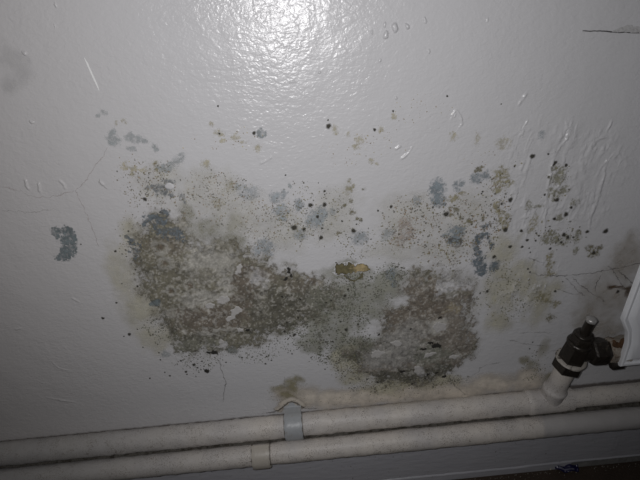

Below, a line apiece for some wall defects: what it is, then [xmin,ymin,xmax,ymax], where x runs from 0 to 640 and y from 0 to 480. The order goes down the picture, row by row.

mould [541,161,570,201]
damp [114,147,563,409]
peeling [332,261,371,282]
mould [520,202,603,276]